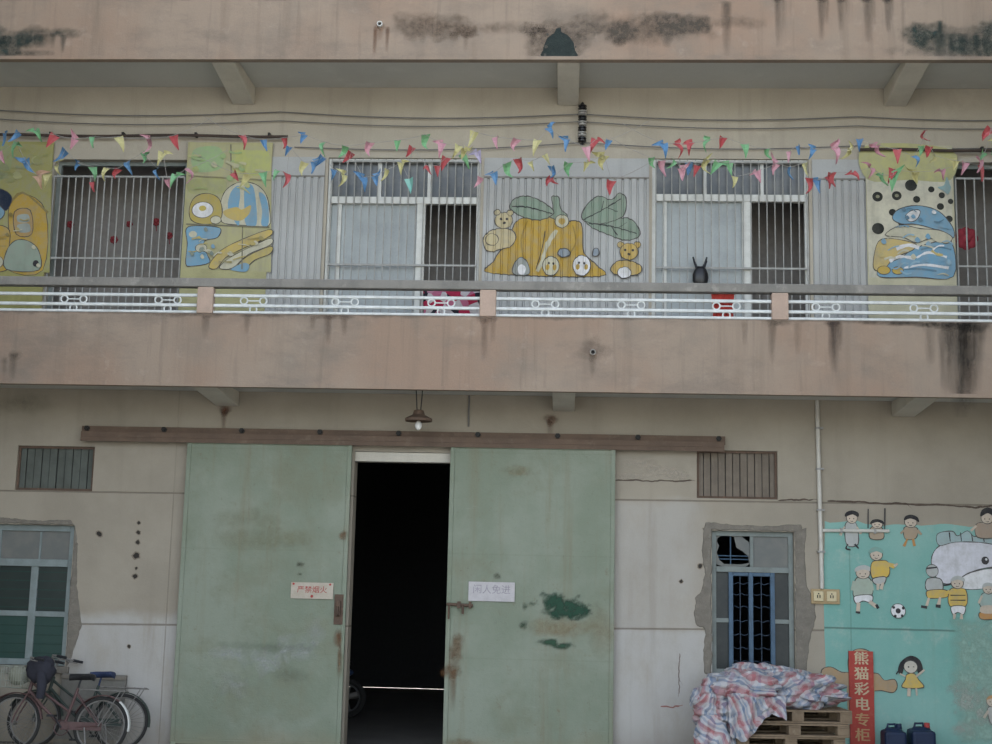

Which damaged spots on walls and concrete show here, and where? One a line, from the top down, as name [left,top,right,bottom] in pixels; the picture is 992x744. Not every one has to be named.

damp [0,31,42,56]
damp [589,15,710,42]
damp [908,22,992,56]
damp [890,322,977,392]
crack [778,498,992,509]
peeling [544,593,590,620]
peeling [543,639,570,649]